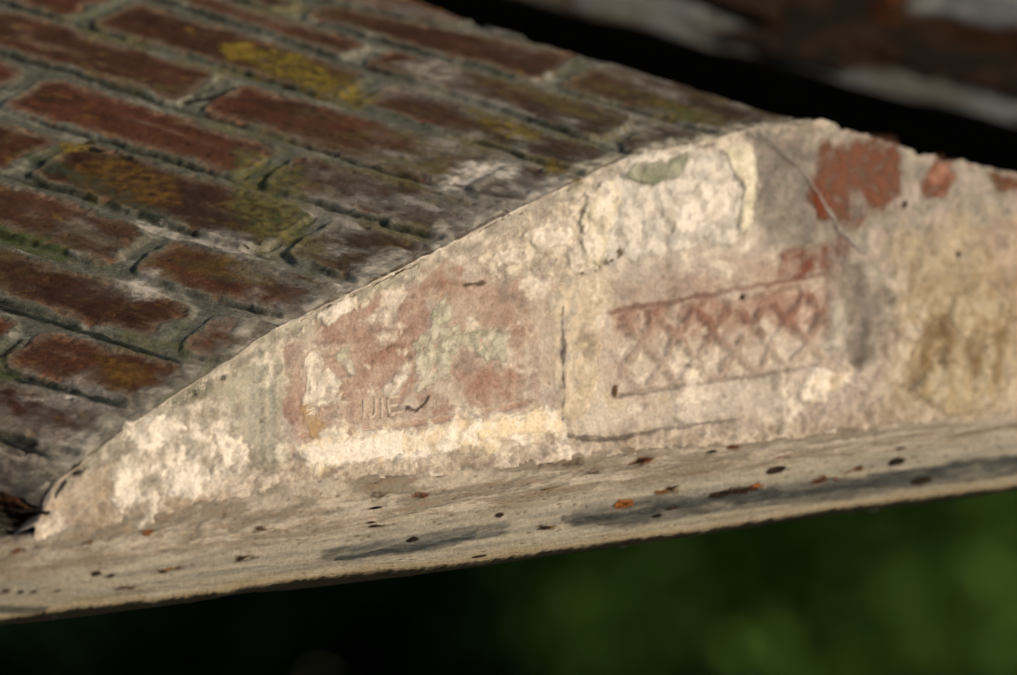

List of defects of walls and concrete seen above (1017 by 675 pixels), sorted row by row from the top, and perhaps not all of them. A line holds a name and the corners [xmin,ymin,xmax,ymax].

spalling [779,138,901,279]
corrosion [813,465,865,483]
corrosion [708,482,764,498]
damp [565,456,1017,525]
corrosion [615,499,634,508]